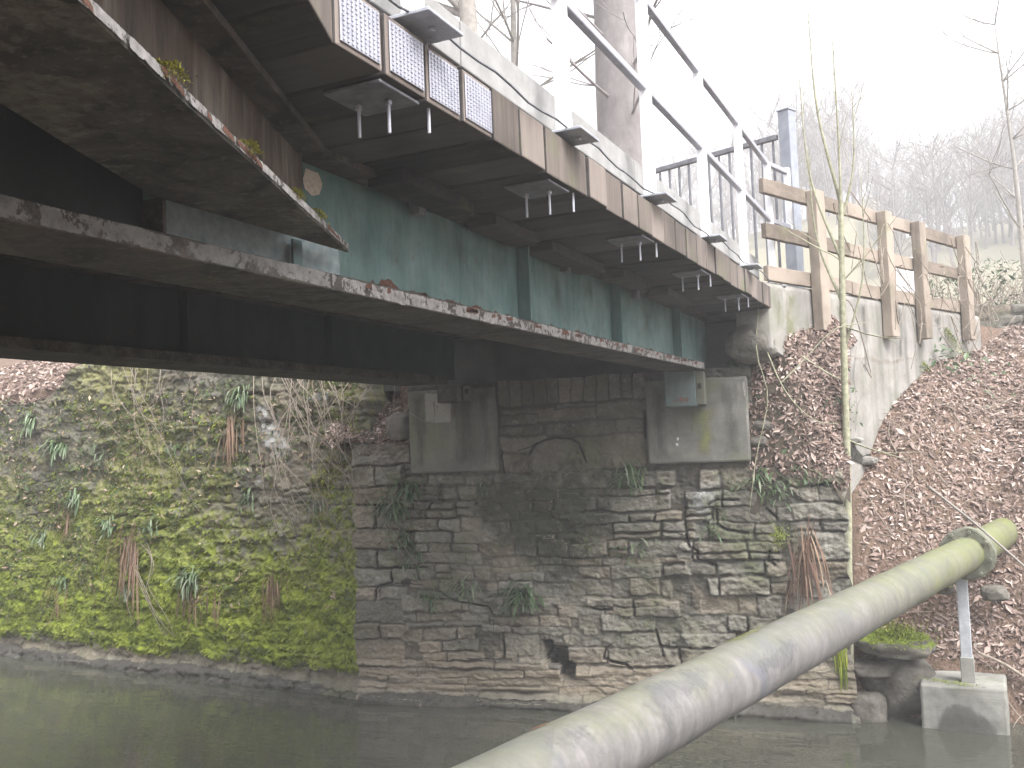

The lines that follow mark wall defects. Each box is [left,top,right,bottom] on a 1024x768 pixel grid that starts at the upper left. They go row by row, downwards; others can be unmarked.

peeling [79,0,349,250]
peeling [0,195,704,368]
corrosion [366,279,513,321]
crack [677,532,717,566]
crack [603,643,636,672]